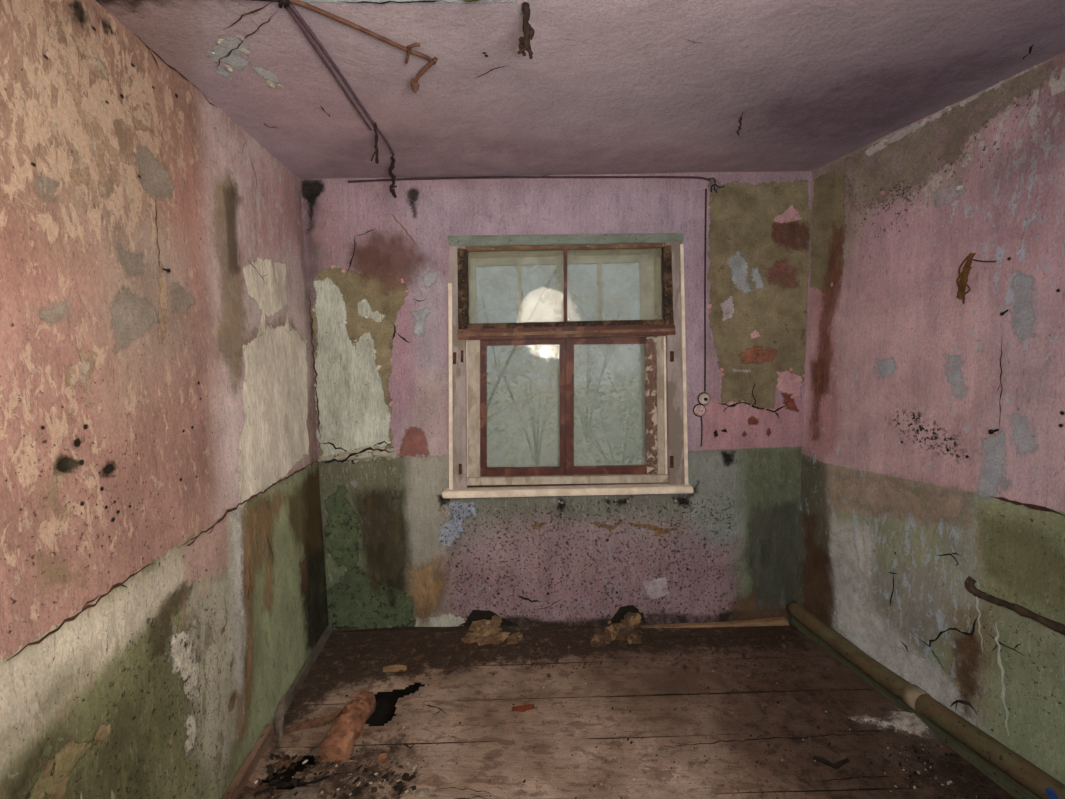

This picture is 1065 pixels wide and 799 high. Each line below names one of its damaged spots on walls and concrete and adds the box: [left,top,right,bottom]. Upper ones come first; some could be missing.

crack [136,35,217,107]
crack [217,2,275,67]
crack [339,0,455,8]
leakage [223,187,238,271]
leakage [358,233,437,290]
peeling [707,60,1054,412]
peeling [216,175,409,741]
leakage [303,470,329,648]
leakage [357,490,411,606]
crack [6,563,153,661]
flaking render [147,585,204,760]